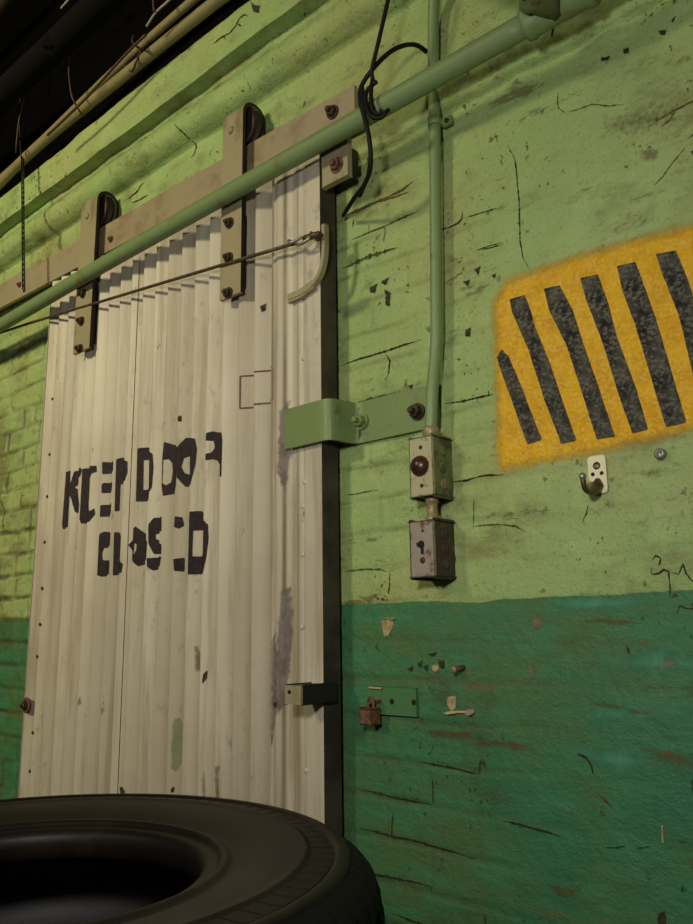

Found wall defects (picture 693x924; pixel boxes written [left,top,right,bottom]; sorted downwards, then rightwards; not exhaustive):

crack [647,100,693,127]
crack [341,180,418,269]
crack [442,208,496,230]
crack [478,148,530,270]
crack [344,340,418,403]
crack [651,554,693,629]
peeling [382,617,395,636]
peeling [407,652,445,672]
peeling [444,696,475,716]